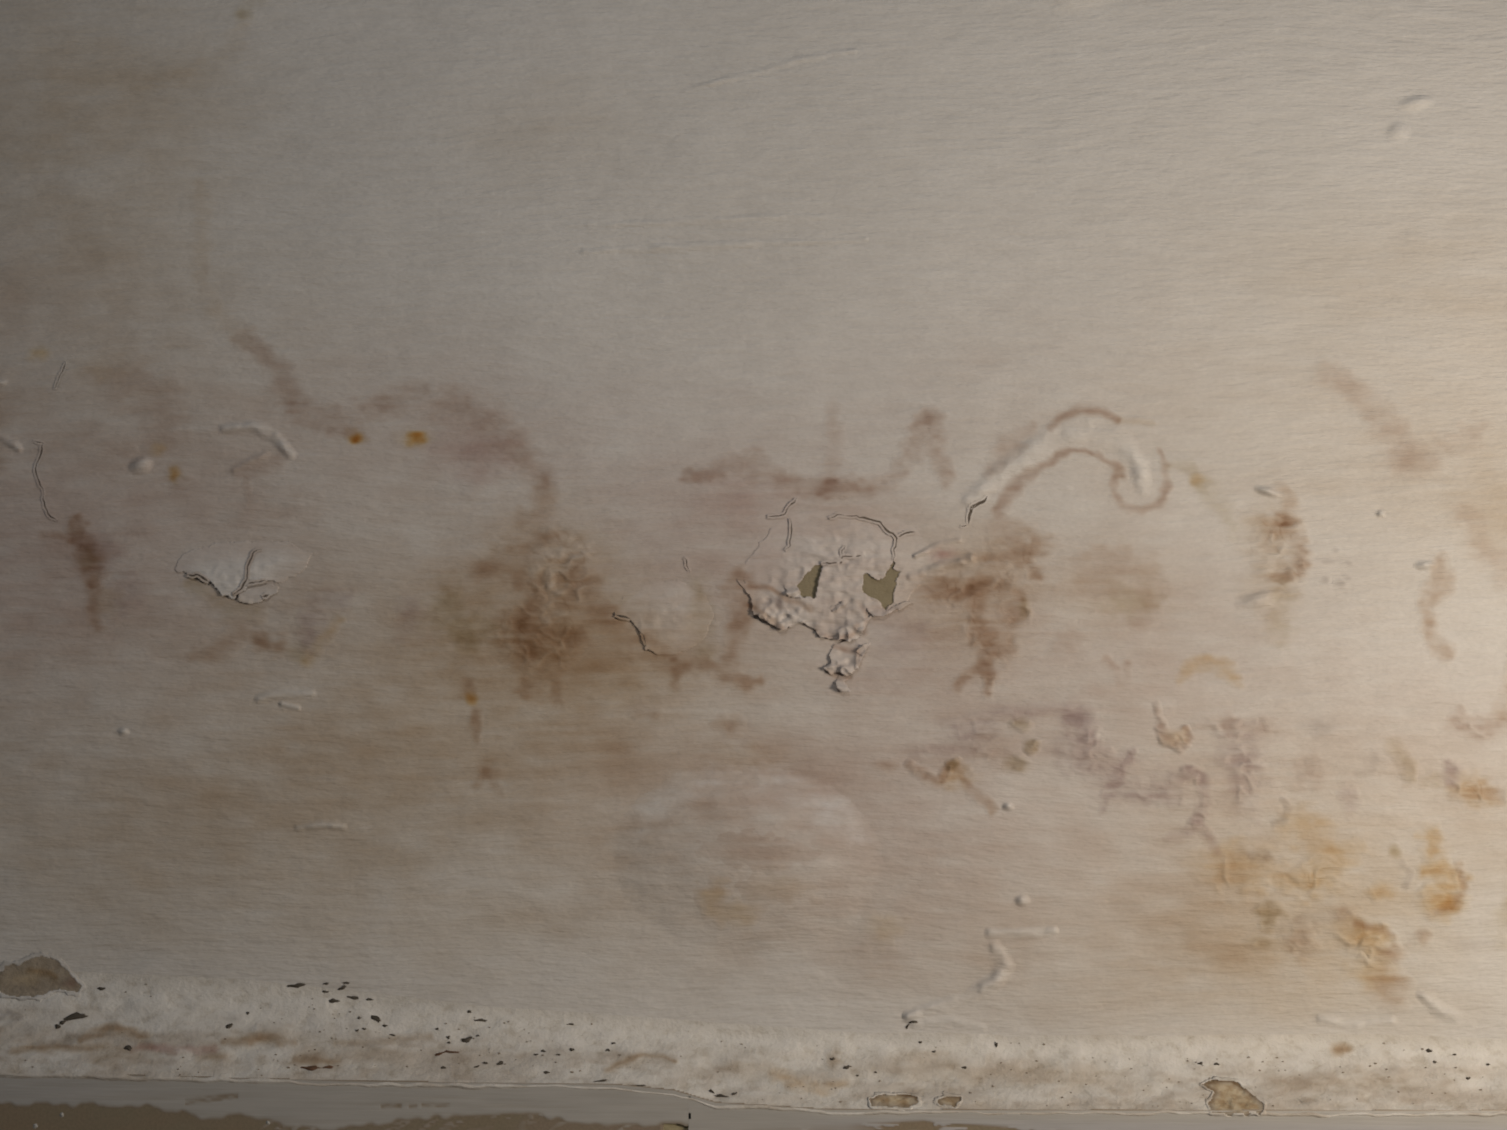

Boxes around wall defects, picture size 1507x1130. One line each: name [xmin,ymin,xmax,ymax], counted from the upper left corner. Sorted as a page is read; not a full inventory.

leakage [0,339,197,483]
leakage [177,174,808,799]
leakage [36,509,153,636]
peeling [175,540,312,604]
peeling [736,504,933,692]
leakage [660,355,1507,1016]
flaking render [0,951,86,1002]
leakage [6,1041,133,1056]
flaking render [1199,1076,1267,1117]